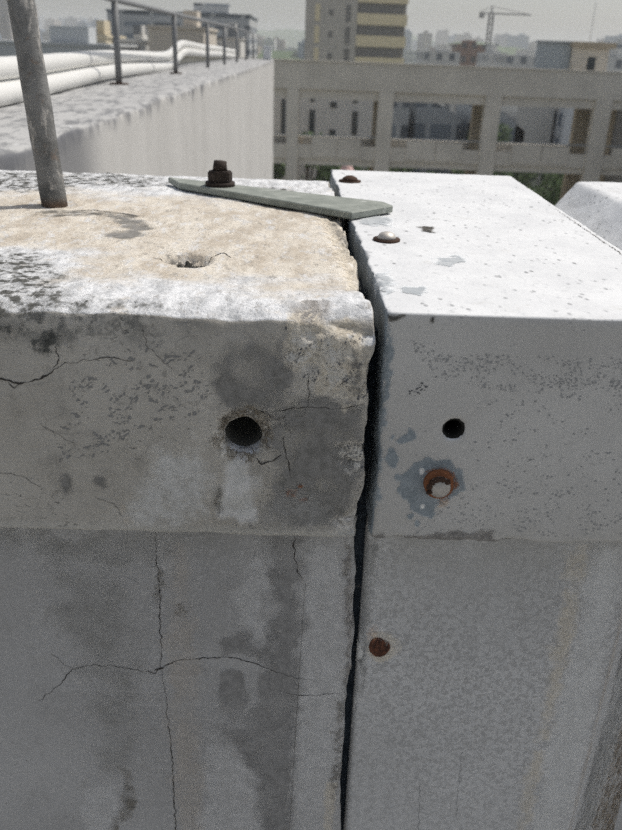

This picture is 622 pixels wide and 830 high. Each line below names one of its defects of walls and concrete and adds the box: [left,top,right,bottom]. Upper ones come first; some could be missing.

crack [0,346,125,389]
flaking render [284,300,369,411]
peeling [341,333,512,541]
rust [426,470,458,495]
spalling [411,340,622,442]
damp [202,344,364,830]
crack [39,534,339,830]